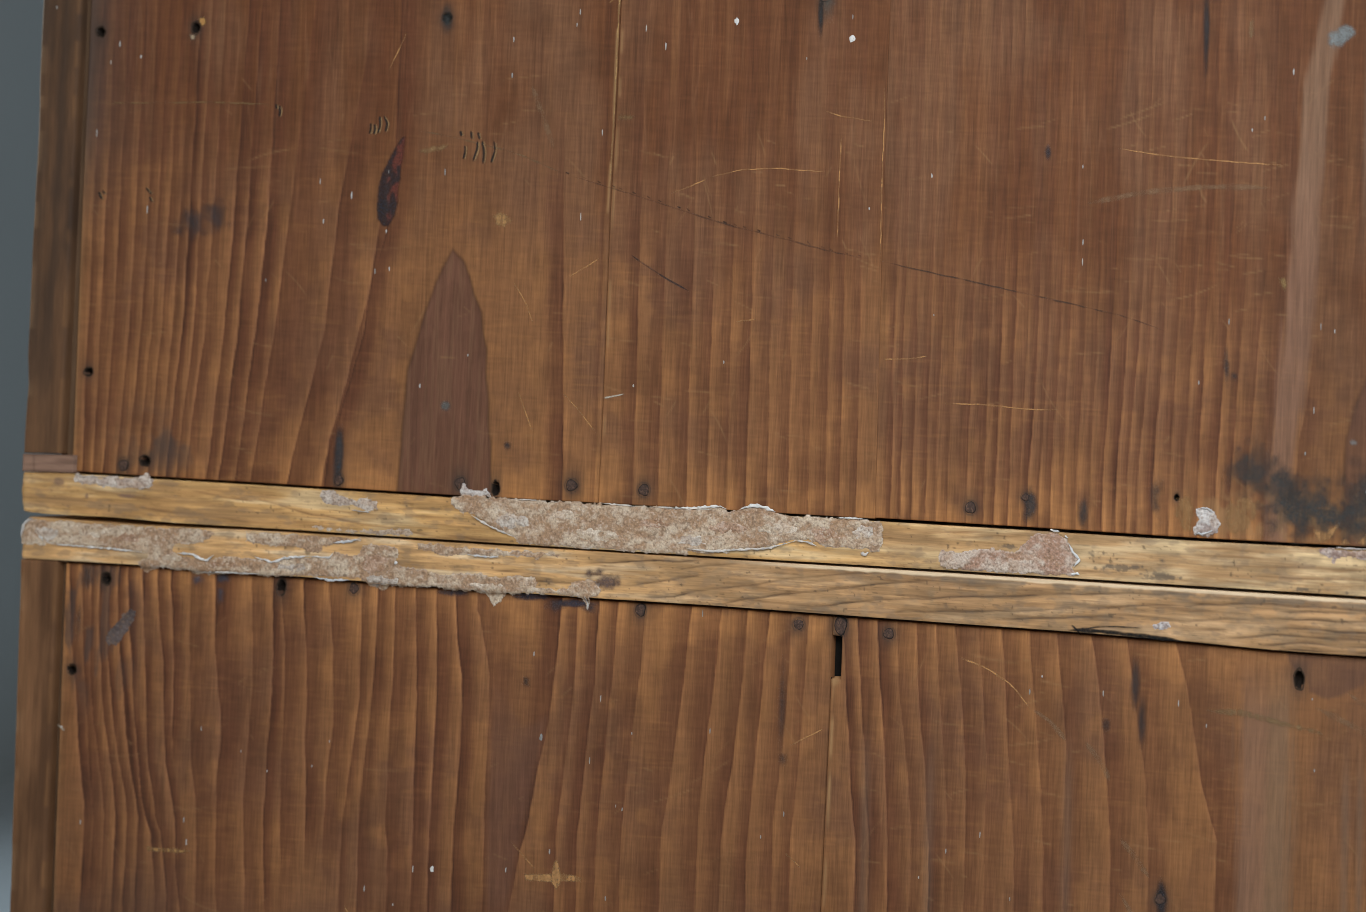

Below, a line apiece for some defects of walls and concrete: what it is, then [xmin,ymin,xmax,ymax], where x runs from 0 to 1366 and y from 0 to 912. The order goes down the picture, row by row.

leakage [1233,455,1366,538]
peeling [21,518,145,553]
peeling [161,499,561,582]
peeling [552,510,618,542]
peeling [603,503,878,556]
peeling [366,561,399,587]
peeling [469,583,503,592]